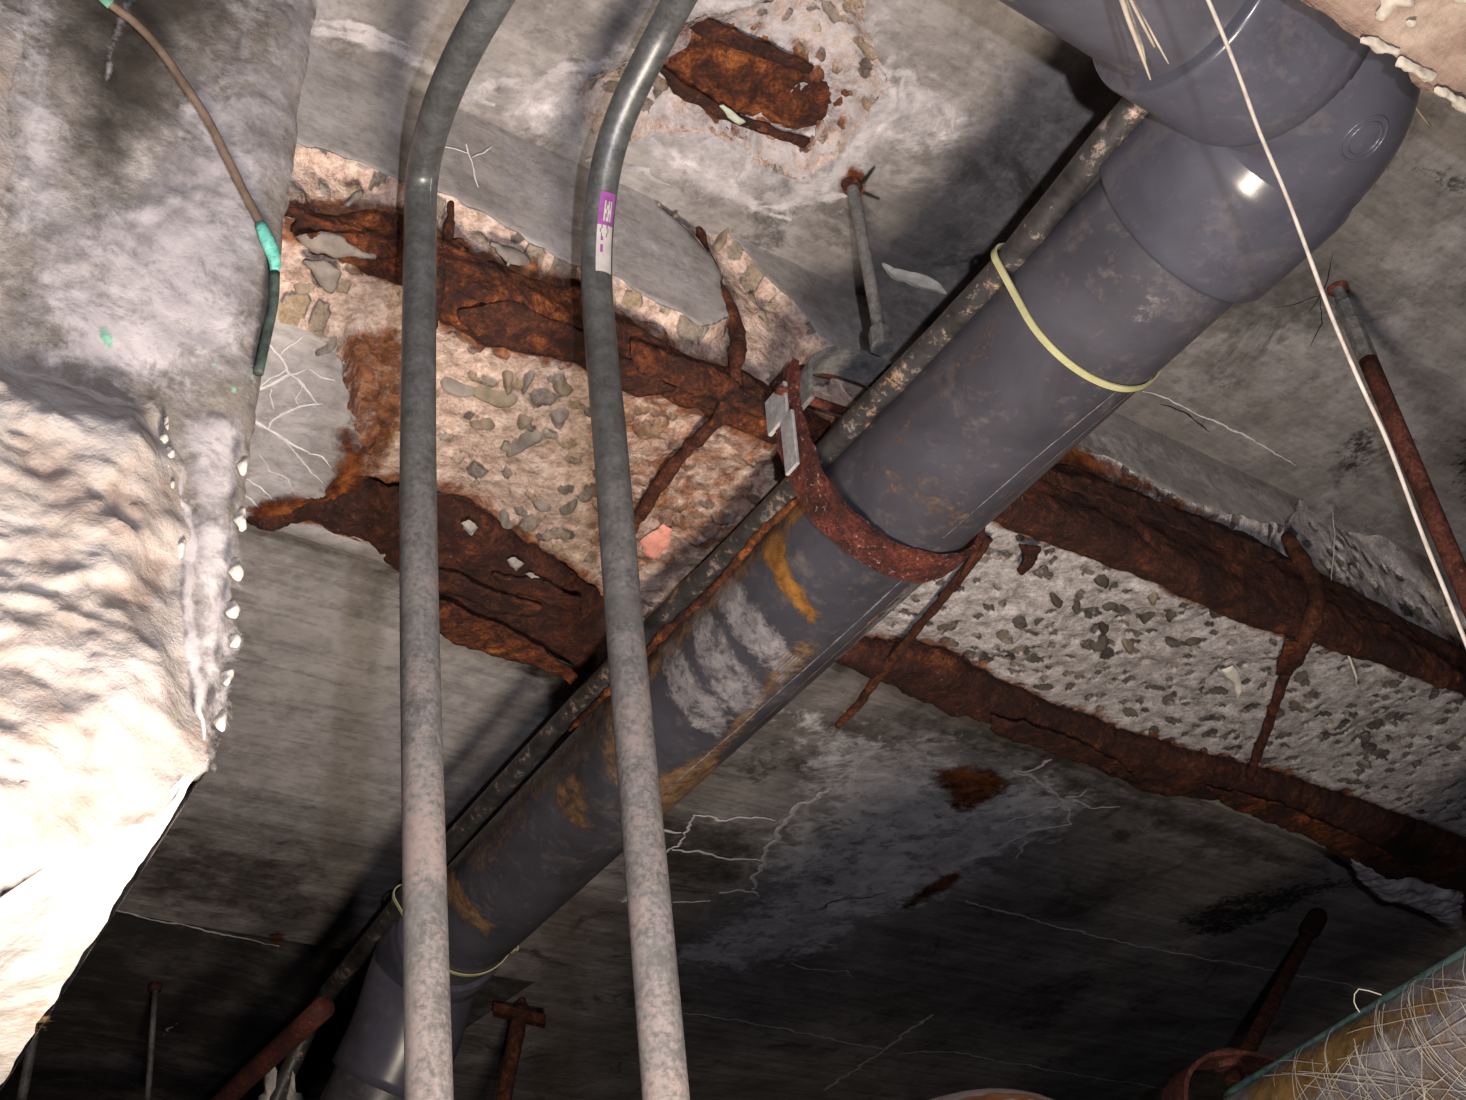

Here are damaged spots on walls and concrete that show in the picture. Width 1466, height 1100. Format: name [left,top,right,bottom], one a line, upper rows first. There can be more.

rust [660,17,836,148]
leakage [0,0,436,891]
crack [245,336,335,507]
spalling [275,143,405,496]
spalling [436,320,603,596]
rust [437,495,608,688]
spalling [622,391,786,621]
rust [835,447,1466,915]
spalling [863,521,1466,839]
leakage [663,815,740,881]
crack [664,788,830,903]
leakage [677,703,1087,973]